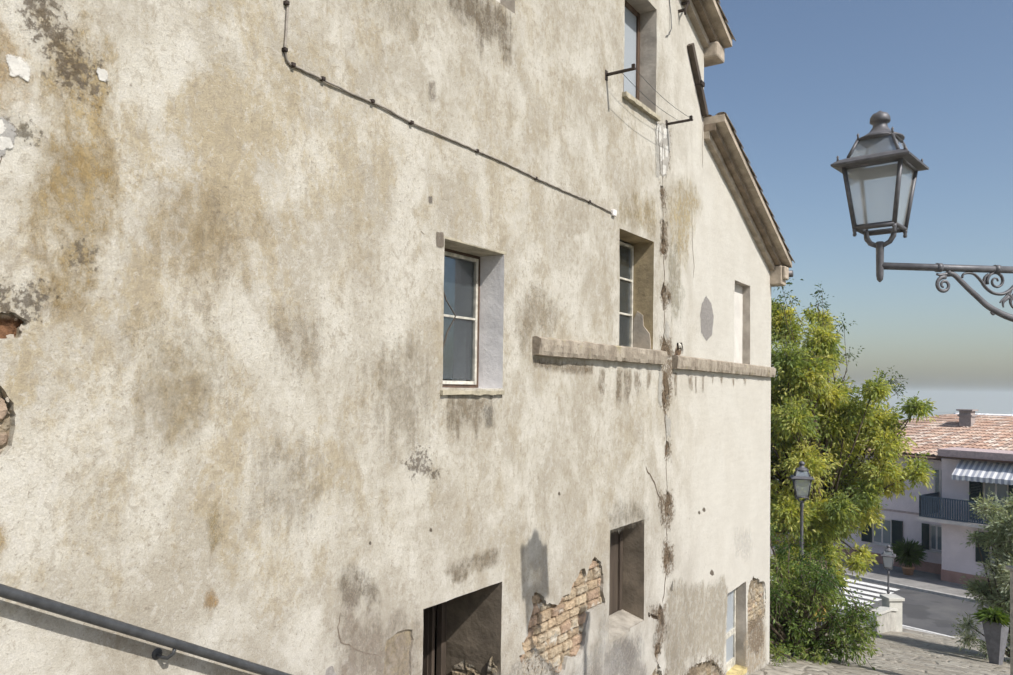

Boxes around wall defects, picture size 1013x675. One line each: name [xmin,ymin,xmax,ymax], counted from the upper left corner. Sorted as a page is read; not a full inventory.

water stain [450,0,511,58]
peeling [6,54,31,81]
peeling [0,119,14,150]
water stain [0,0,115,323]
flaking render [0,311,25,339]
crack [646,126,725,675]
flaking render [510,559,606,675]
crack [748,614,764,655]